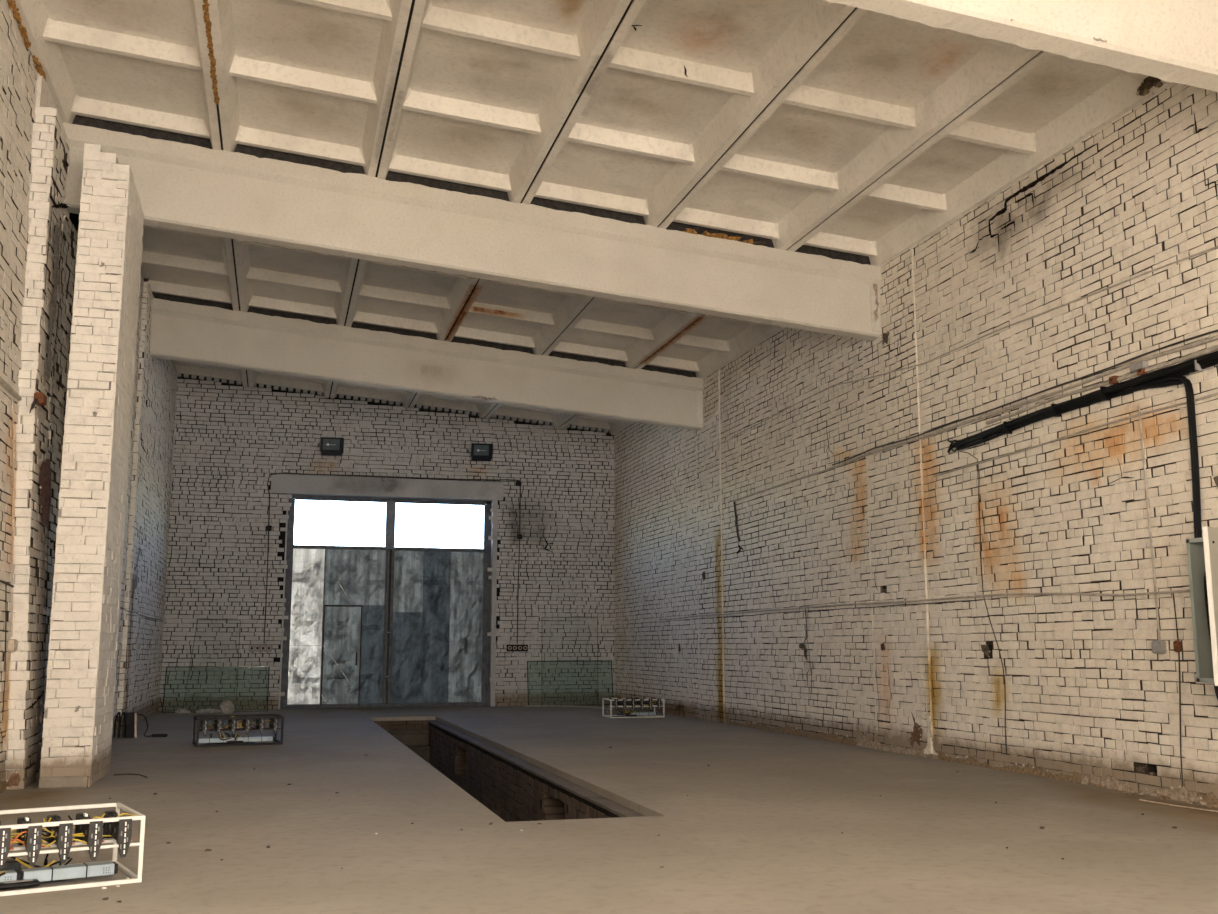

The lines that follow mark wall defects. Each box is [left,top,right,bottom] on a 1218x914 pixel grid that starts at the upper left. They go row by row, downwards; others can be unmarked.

spalling [1136,76,1163,96]
crack [970,150,1085,254]